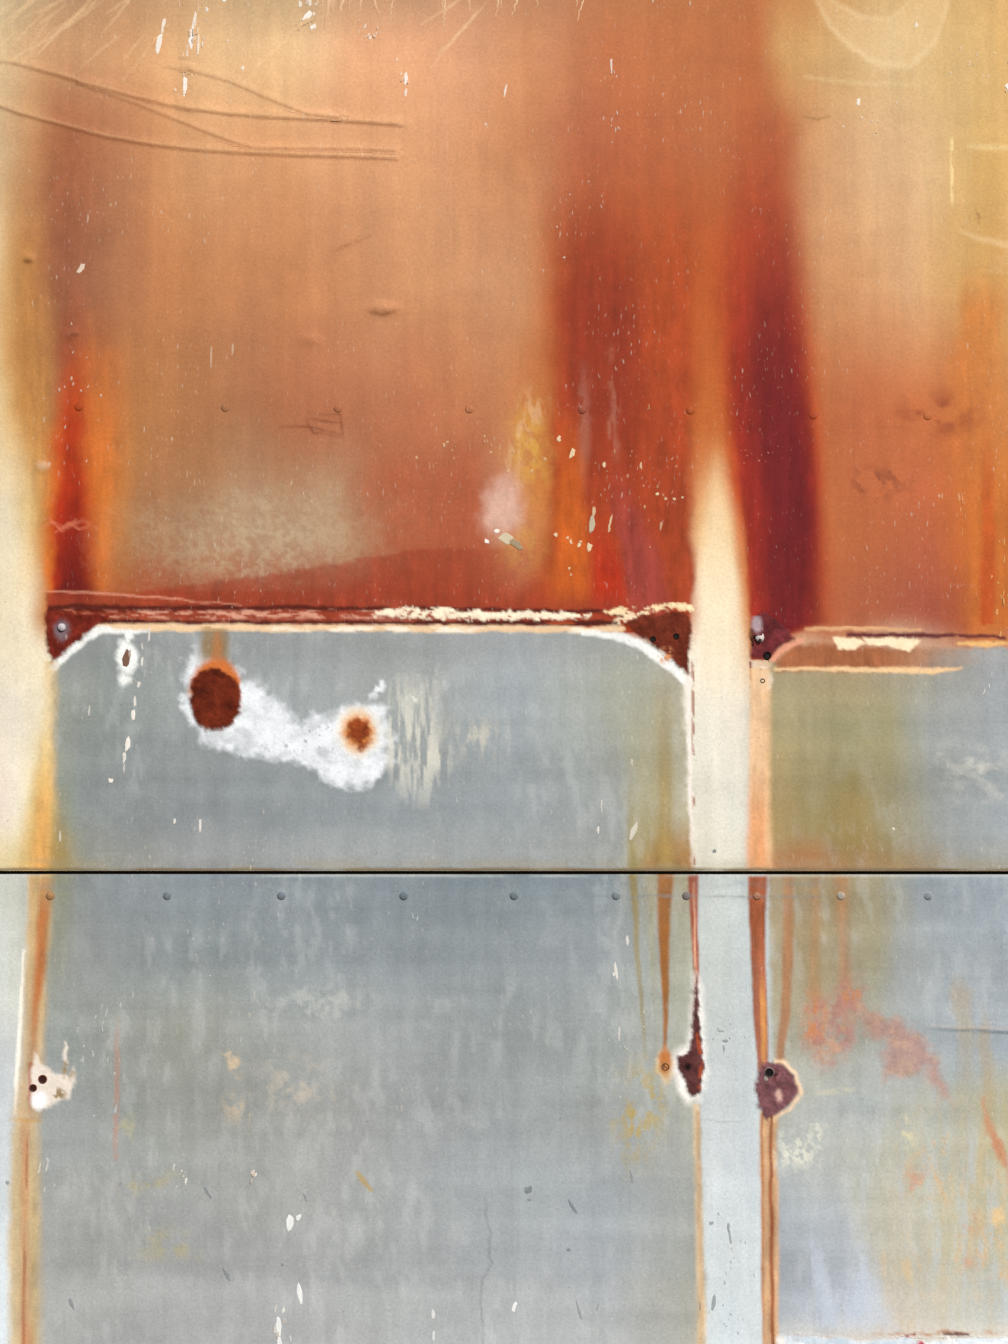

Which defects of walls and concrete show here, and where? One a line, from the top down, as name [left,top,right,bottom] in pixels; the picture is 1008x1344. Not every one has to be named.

peeling [298,0,318,32]
corrosion [7,57,1008,866]
corrosion [3,874,75,1344]
peeling [0,575,1008,1344]
corrosion [609,876,712,1344]
corrosion [745,879,956,1344]
corrosion [859,1327,1008,1340]
corrosion [957,1203,990,1274]